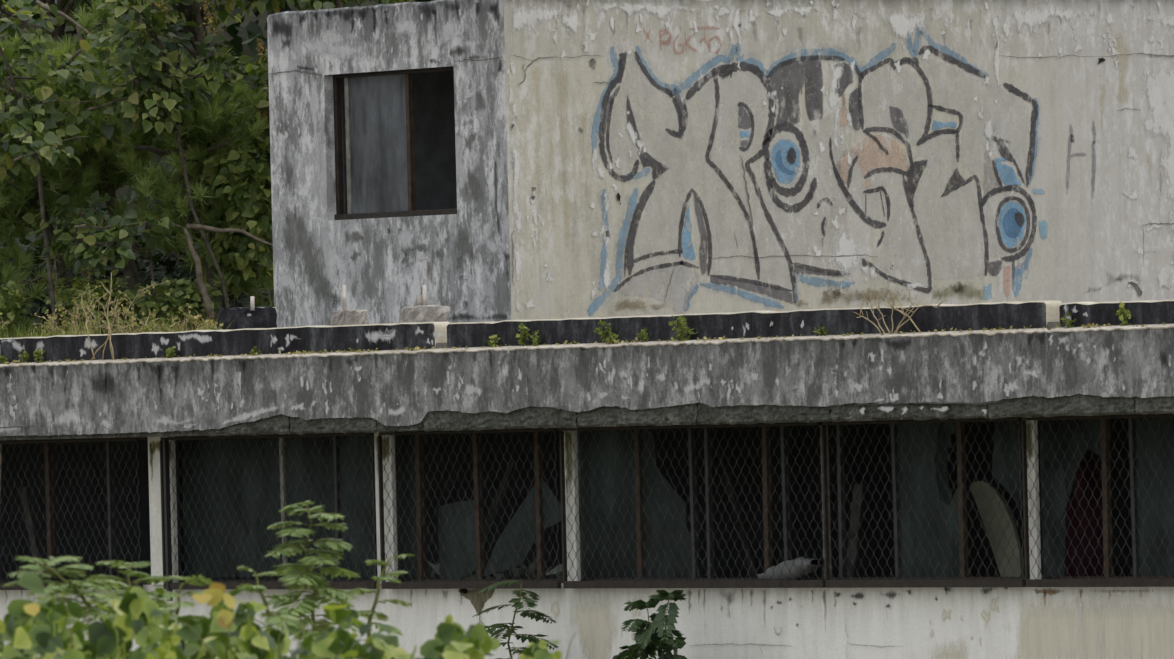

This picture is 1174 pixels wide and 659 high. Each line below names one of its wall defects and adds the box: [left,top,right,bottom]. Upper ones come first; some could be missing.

water stain [273,7,388,47]
water stain [475,2,499,22]
peeling [512,0,700,69]
peeling [714,0,839,72]
peeling [883,11,924,73]
peeling [984,1,1125,103]
peeling [1143,69,1174,240]
water stain [286,216,340,307]
water stain [346,232,363,260]
peeling [356,330,395,343]
water stain [881,339,911,349]
water stain [137,364,179,396]